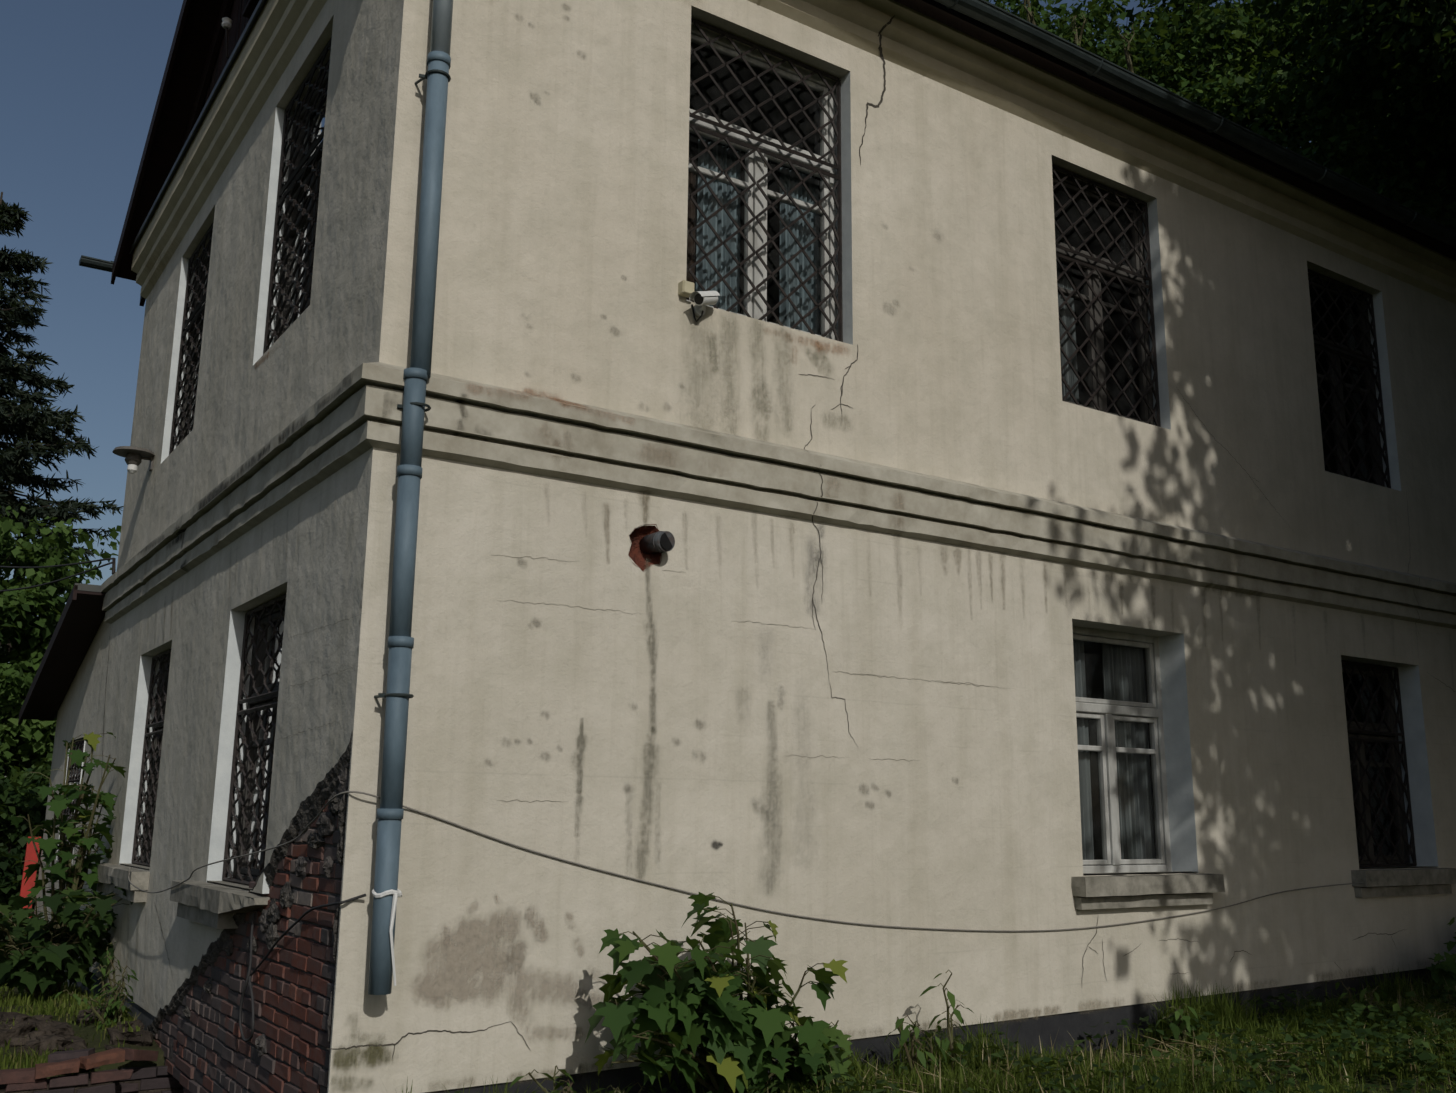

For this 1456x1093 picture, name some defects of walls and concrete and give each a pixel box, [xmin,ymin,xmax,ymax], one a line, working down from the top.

crack [859,15,895,165]
crack [745,352,1013,761]
spalling [146,732,353,1093]